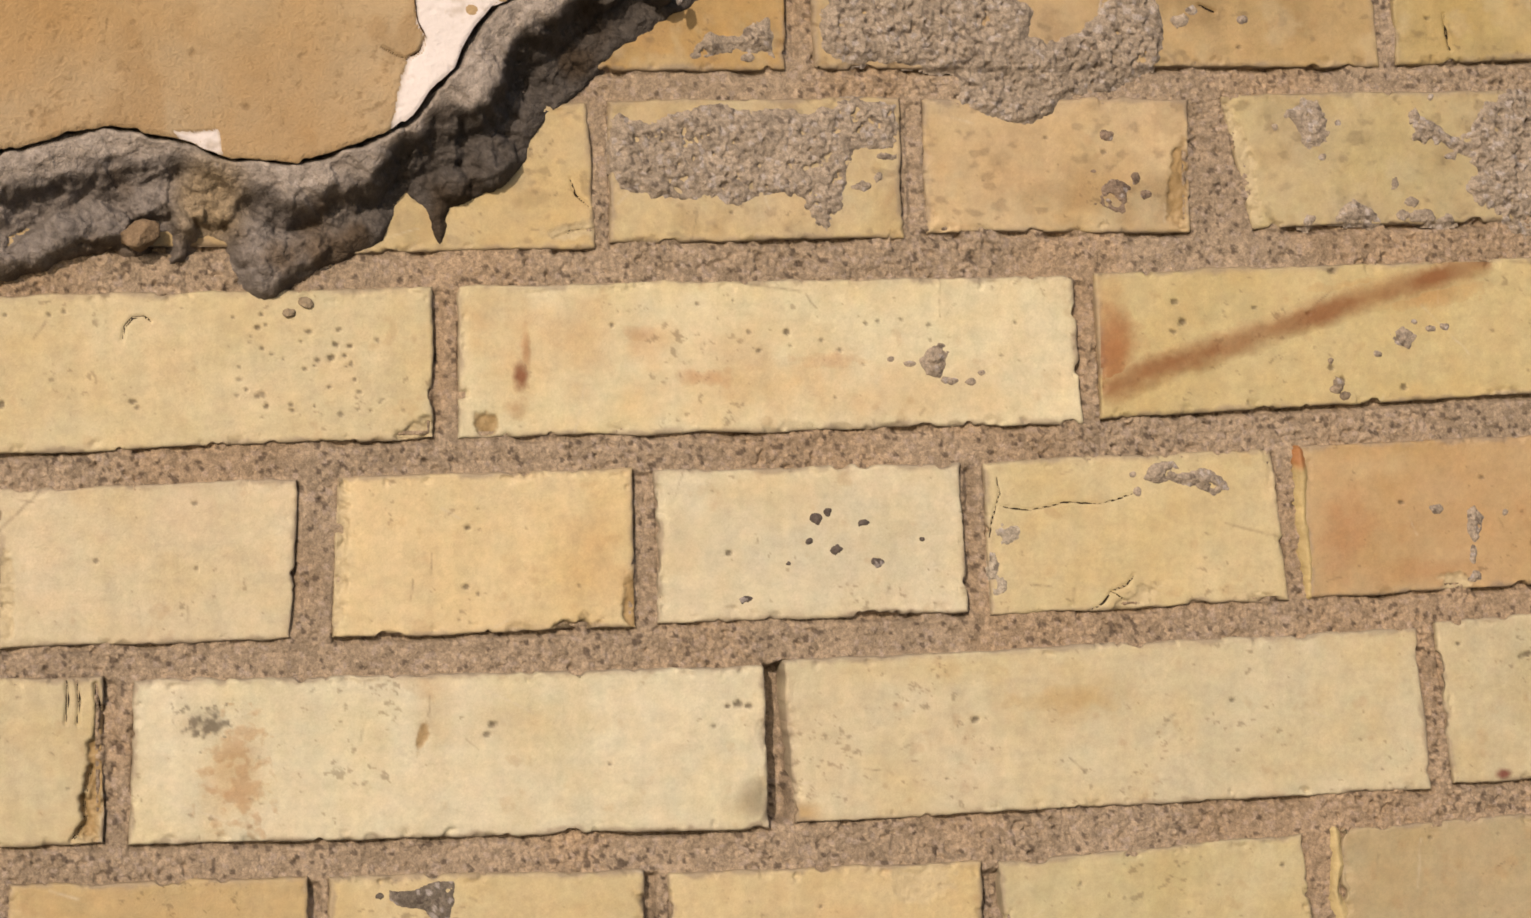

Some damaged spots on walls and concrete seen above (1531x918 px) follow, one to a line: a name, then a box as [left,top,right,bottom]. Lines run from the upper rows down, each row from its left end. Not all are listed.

spalling [0,0,698,318]
peeling [851,152,897,192]
peeling [1391,177,1458,230]
peeling [1408,94,1471,160]
corrosion [1099,261,1513,415]